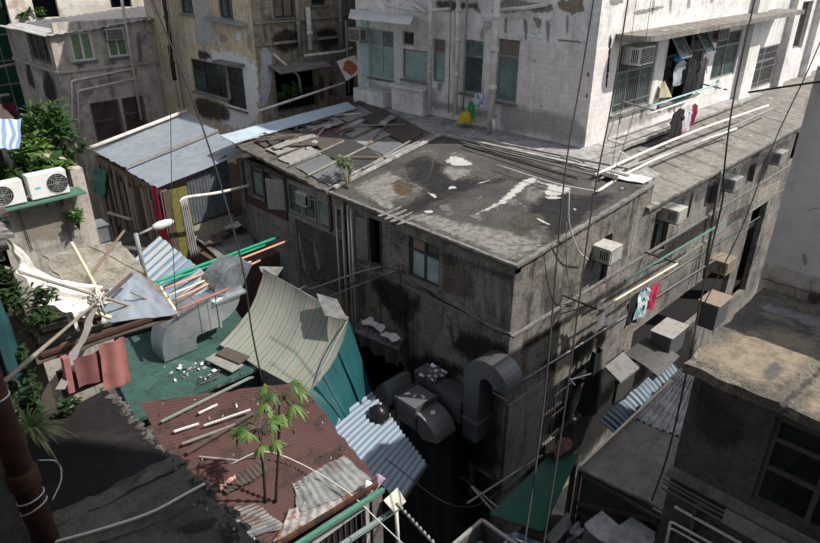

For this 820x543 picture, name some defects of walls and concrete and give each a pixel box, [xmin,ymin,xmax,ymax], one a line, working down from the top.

peeling [500,0,584,40]
peeling [205,32,273,131]
water stain [476,178,611,238]
water stain [372,278,420,330]
water stain [451,330,506,360]